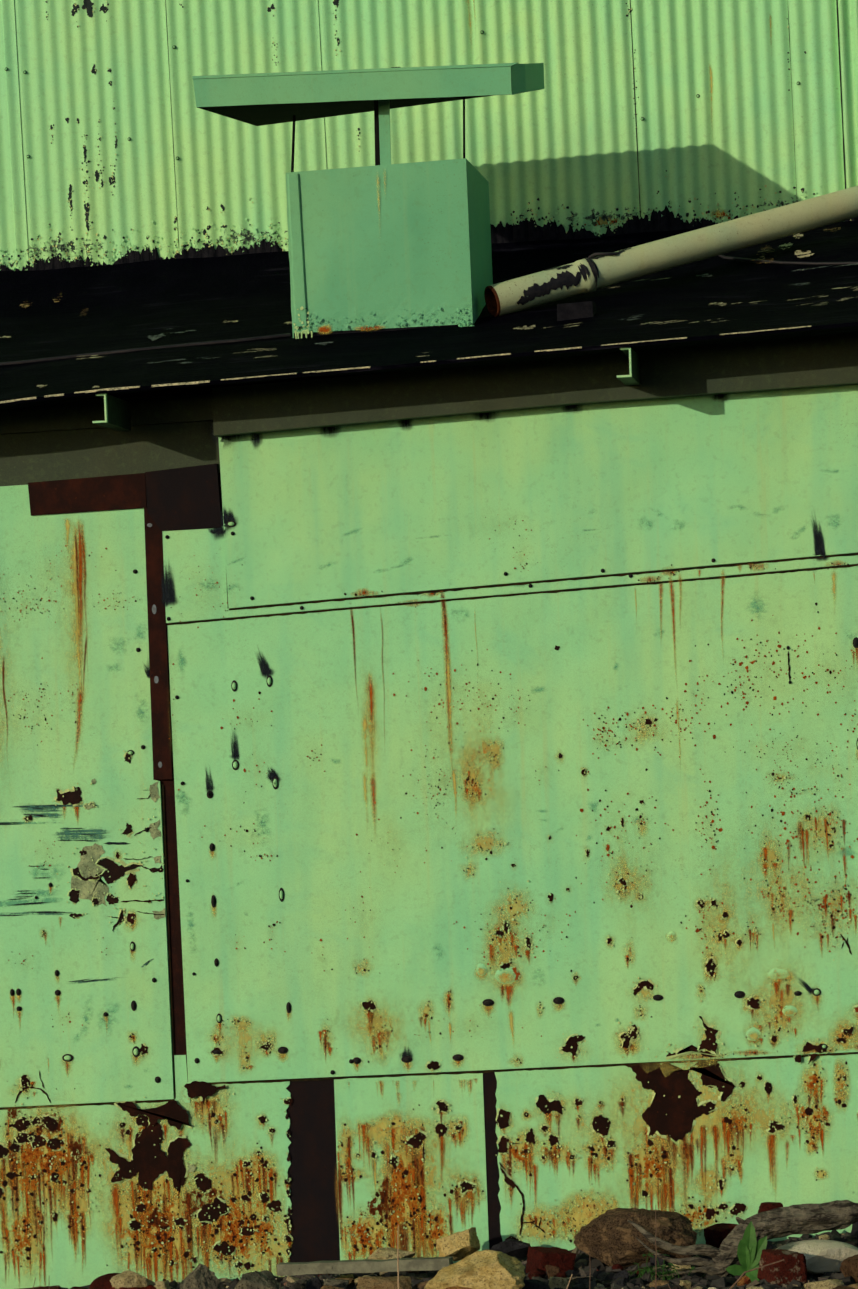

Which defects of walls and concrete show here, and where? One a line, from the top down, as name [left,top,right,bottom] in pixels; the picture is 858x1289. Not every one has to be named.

corrosion [65,520,87,748]
peeling [29,779,164,955]
corrosion [344,590,452,818]
corrosion [453,741,504,804]
corrosion [745,773,857,961]
corrosion [687,959,820,1059]
corrosion [0,1080,290,1282]
peeling [0,1080,293,1274]
corrosion [337,1105,484,1260]
peeling [495,1016,772,1221]
corrosion [500,1018,858,1243]
peeling [764,1094,798,1176]